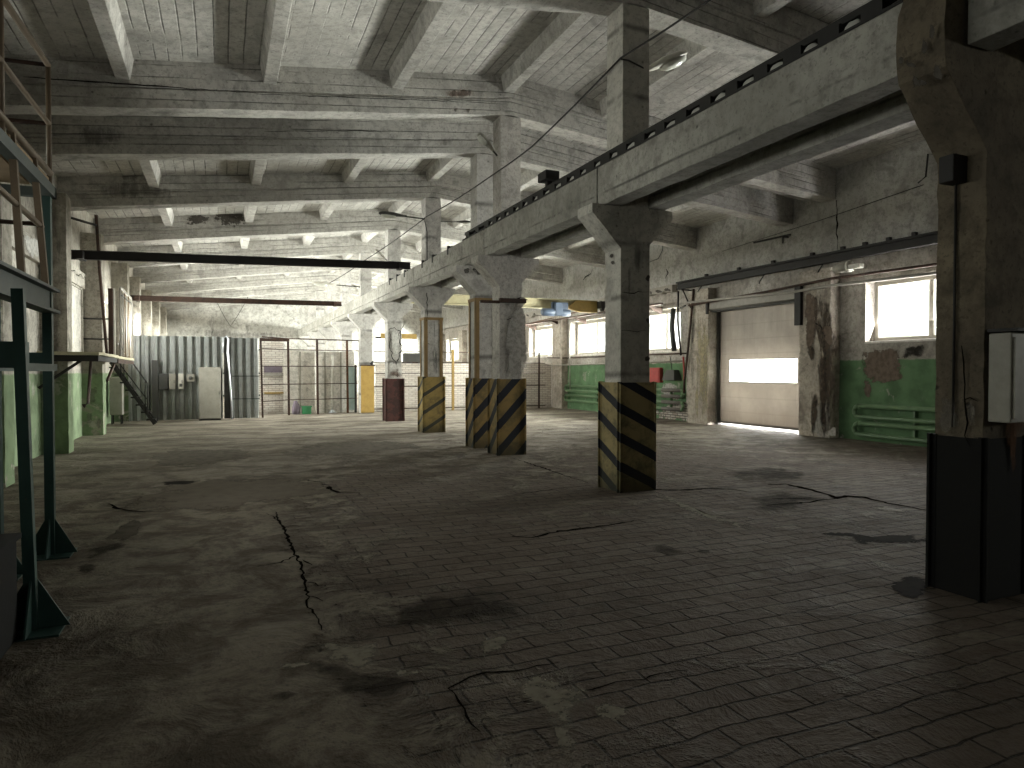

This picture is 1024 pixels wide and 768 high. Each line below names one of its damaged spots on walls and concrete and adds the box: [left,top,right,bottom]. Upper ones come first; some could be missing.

peeling [862,348,902,397]
spalling [810,402,836,438]
crack [656,484,924,510]
crack [512,520,634,538]
crack [261,512,323,630]